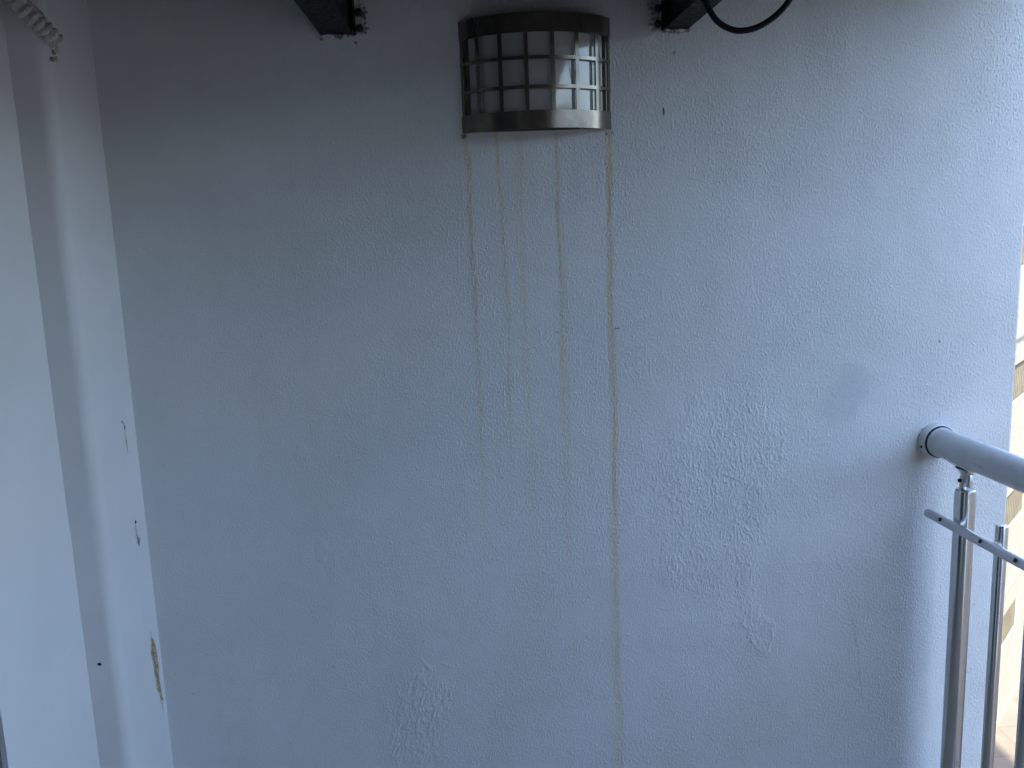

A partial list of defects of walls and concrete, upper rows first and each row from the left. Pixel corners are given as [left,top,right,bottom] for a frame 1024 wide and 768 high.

corrosion [605,132,626,768]